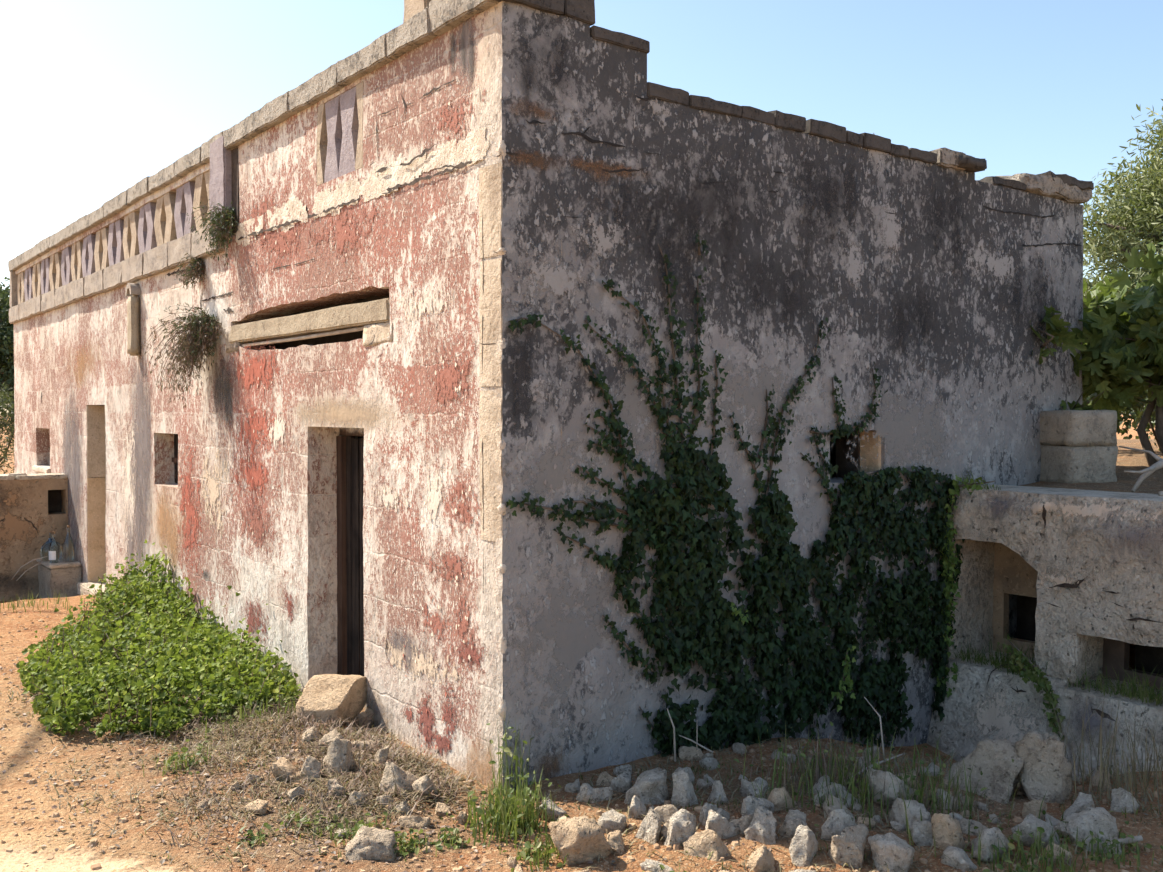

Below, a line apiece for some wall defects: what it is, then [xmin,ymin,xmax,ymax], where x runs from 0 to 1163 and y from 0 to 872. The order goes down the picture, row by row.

crack [238,41,535,269]
peeling [392,286,452,324]
peeling [425,336,471,411]
peeling [120,408,137,576]
peeling [175,341,293,600]
peeling [372,485,410,513]
peeling [424,467,482,533]
peeling [239,592,272,650]
peeling [283,594,294,625]
peeling [376,550,507,758]